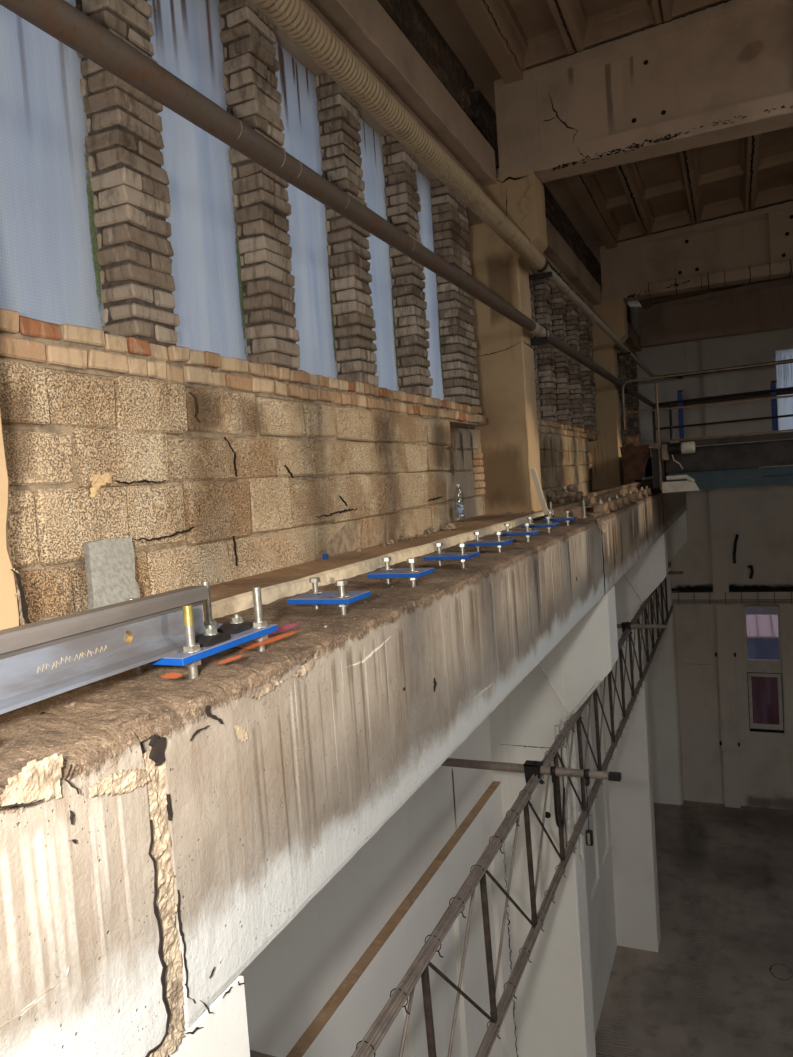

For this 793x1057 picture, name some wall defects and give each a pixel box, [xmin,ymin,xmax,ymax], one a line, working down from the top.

crack [483,0,730,72]
crack [543,96,793,243]
crack [188,392,200,422]
crack [224,437,238,477]
crack [115,478,166,486]
crack [132,505,204,541]
crack [315,496,358,517]
crack [231,536,239,566]
spalling [0,754,63,809]
spalling [88,734,167,798]